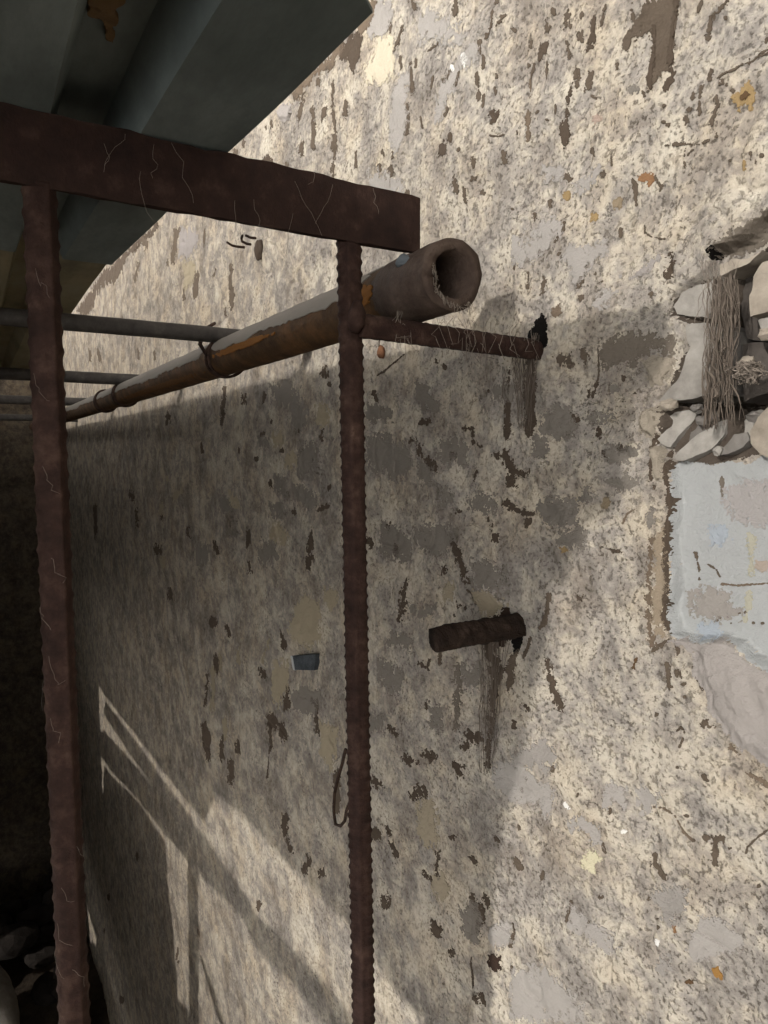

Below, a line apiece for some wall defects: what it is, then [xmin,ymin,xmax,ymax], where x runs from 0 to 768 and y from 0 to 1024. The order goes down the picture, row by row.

spalling [670,277,746,328]
spalling [757,328,768,343]
flaking render [650,344,768,673]